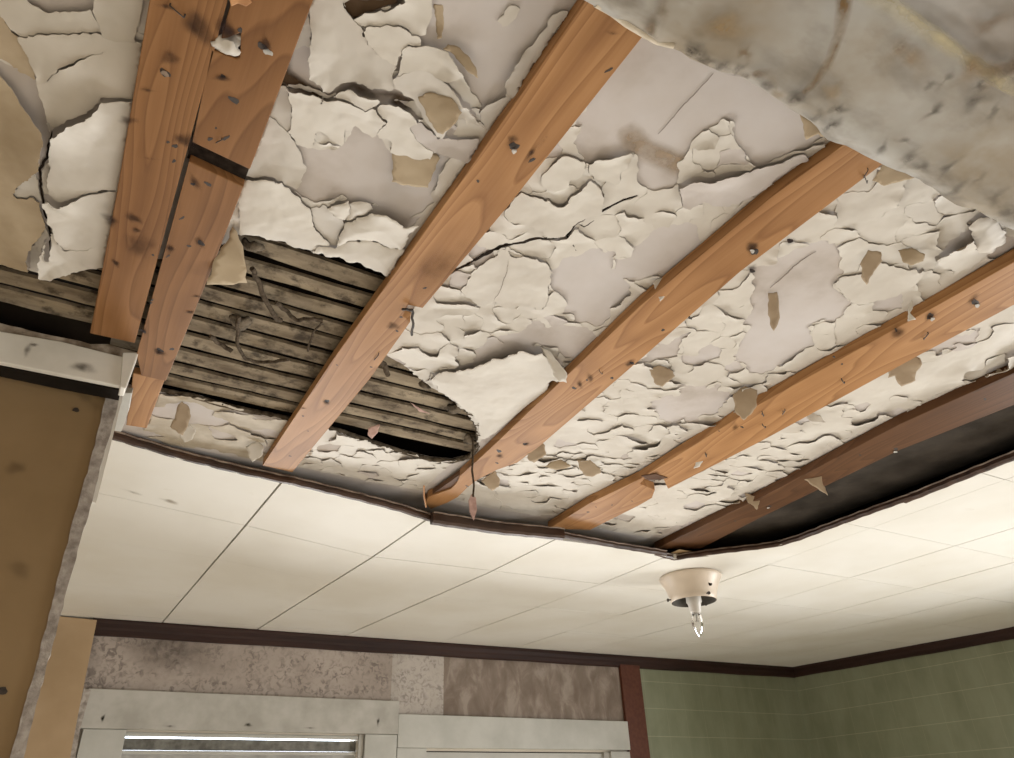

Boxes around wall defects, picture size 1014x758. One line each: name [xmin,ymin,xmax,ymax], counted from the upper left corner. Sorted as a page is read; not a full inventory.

mould [687,47,741,72]
water stain [762,40,840,102]
water stain [838,0,850,24]
peeling [0,0,150,281]
peeling [207,0,568,285]
water stain [626,134,683,171]
crack [451,195,637,300]
peeling [297,97,830,491]
peeling [455,167,1014,538]